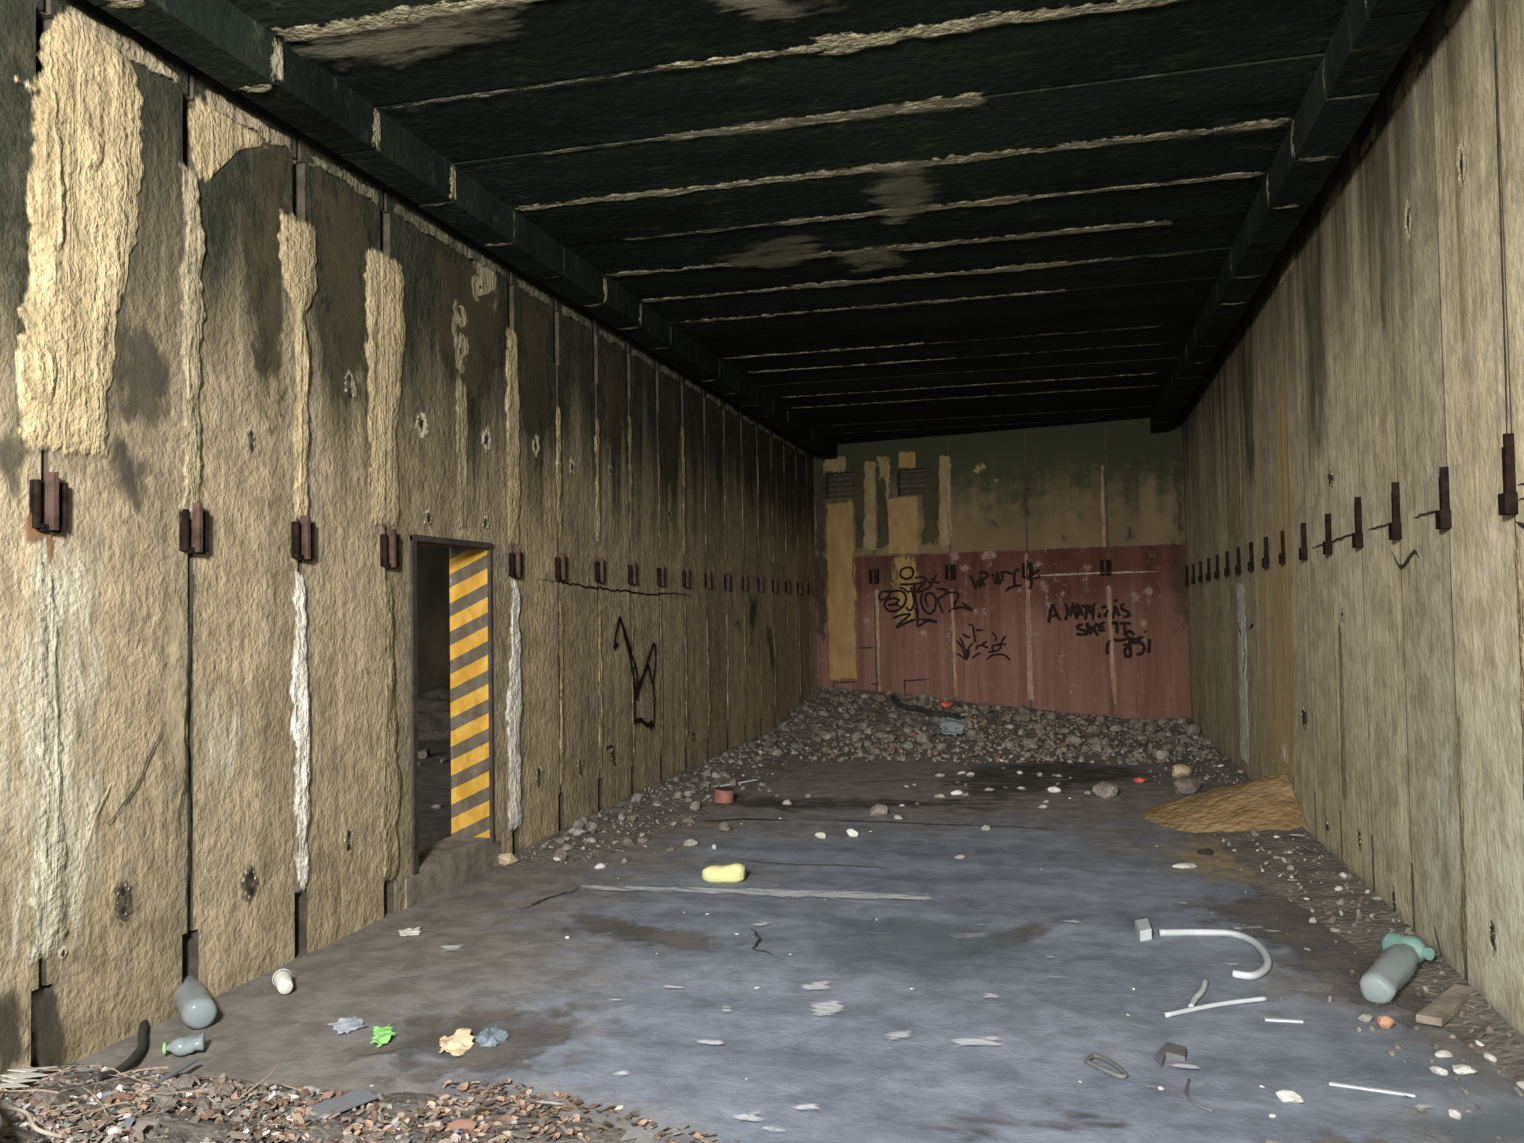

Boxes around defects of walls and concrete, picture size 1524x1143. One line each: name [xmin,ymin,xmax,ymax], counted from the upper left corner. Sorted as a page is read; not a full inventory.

peeling [15,77,65,251]
peeling [27,344,57,406]
water stain [0,533,102,965]
water stain [290,572,311,889]
water stain [0,991,63,1071]